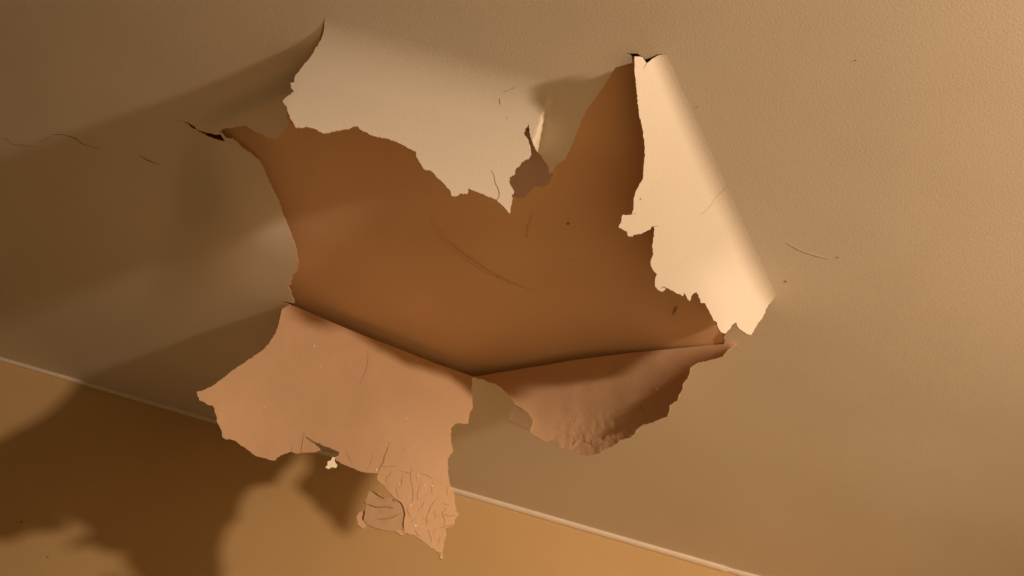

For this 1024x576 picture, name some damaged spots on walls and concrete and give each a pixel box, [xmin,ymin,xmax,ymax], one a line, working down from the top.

crack [185,122,224,141]
flaking render [133,17,786,560]